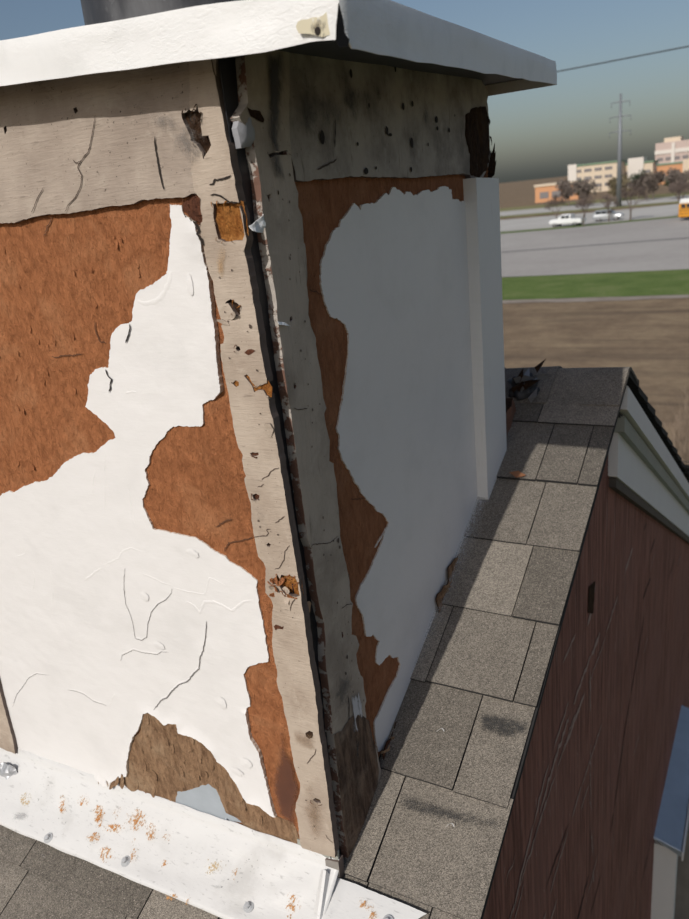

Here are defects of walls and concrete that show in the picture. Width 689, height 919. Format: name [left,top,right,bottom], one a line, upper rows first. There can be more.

damp [270,56,283,175]
crack [31,117,95,237]
crack [154,137,164,189]
spalling [211,201,249,243]
peeling [0,194,202,496]
peeling [278,166,466,742]
peeling [143,276,316,839]
crack [120,567,224,661]
crack [12,672,50,707]
crack [155,620,208,708]
corrosion [89,805,154,863]